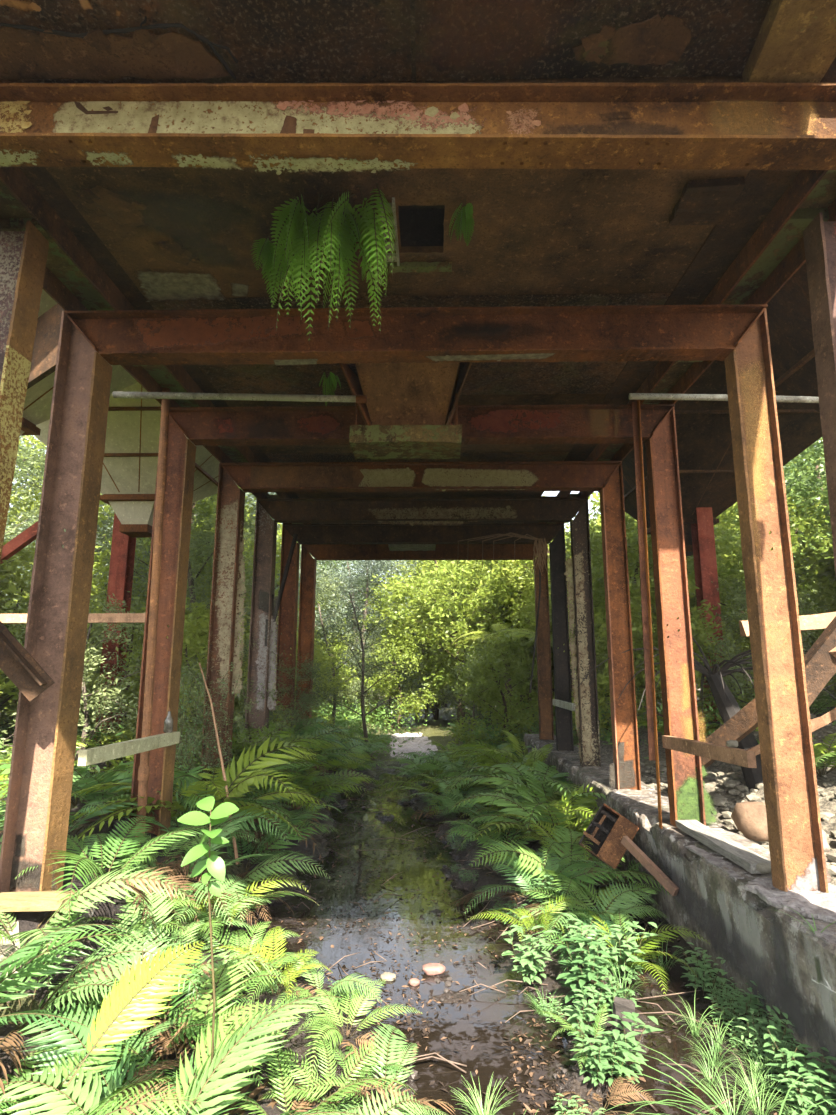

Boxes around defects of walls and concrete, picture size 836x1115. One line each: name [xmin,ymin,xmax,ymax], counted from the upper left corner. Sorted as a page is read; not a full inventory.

peeling [0,0,41,12]
corrosion [572,14,692,66]
peeling [0,101,33,133]
peeling [52,100,487,134]
peeling [505,107,542,135]
peeling [0,148,42,167]
peeling [82,150,134,168]
peeling [172,150,418,175]
crack [812,974,836,993]